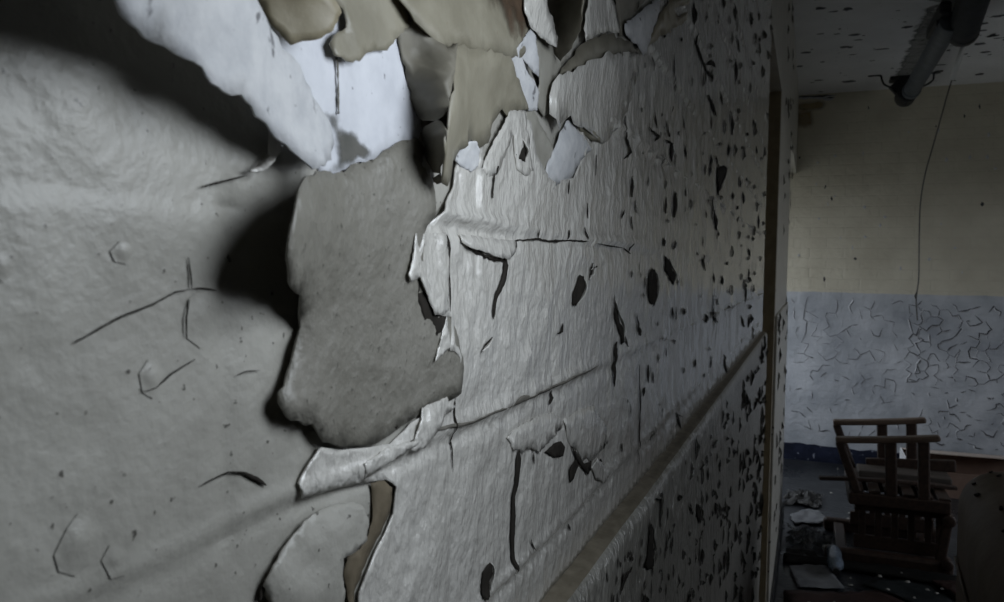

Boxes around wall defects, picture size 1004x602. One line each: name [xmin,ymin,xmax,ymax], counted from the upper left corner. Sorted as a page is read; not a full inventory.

crack [74,258,216,391]
crack [445,235,453,311]
peeling [114,0,788,602]
crack [512,238,634,256]
crack [789,298,1004,451]
crack [198,471,266,487]